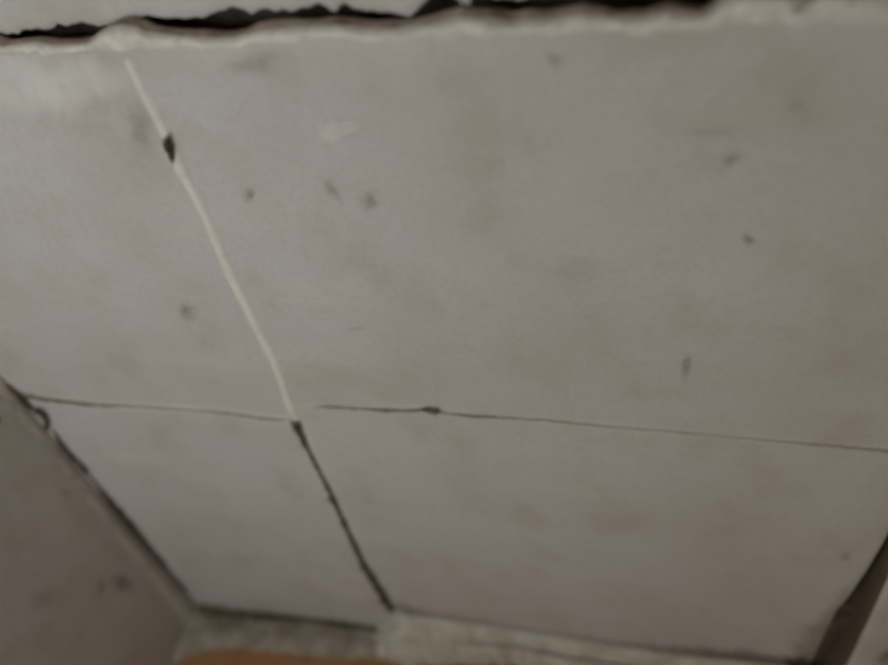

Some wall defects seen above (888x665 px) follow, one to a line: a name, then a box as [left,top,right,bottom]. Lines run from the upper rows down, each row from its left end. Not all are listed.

crack [0,0,888,56]
crack [5,383,394,633]
crack [743,559,874,665]